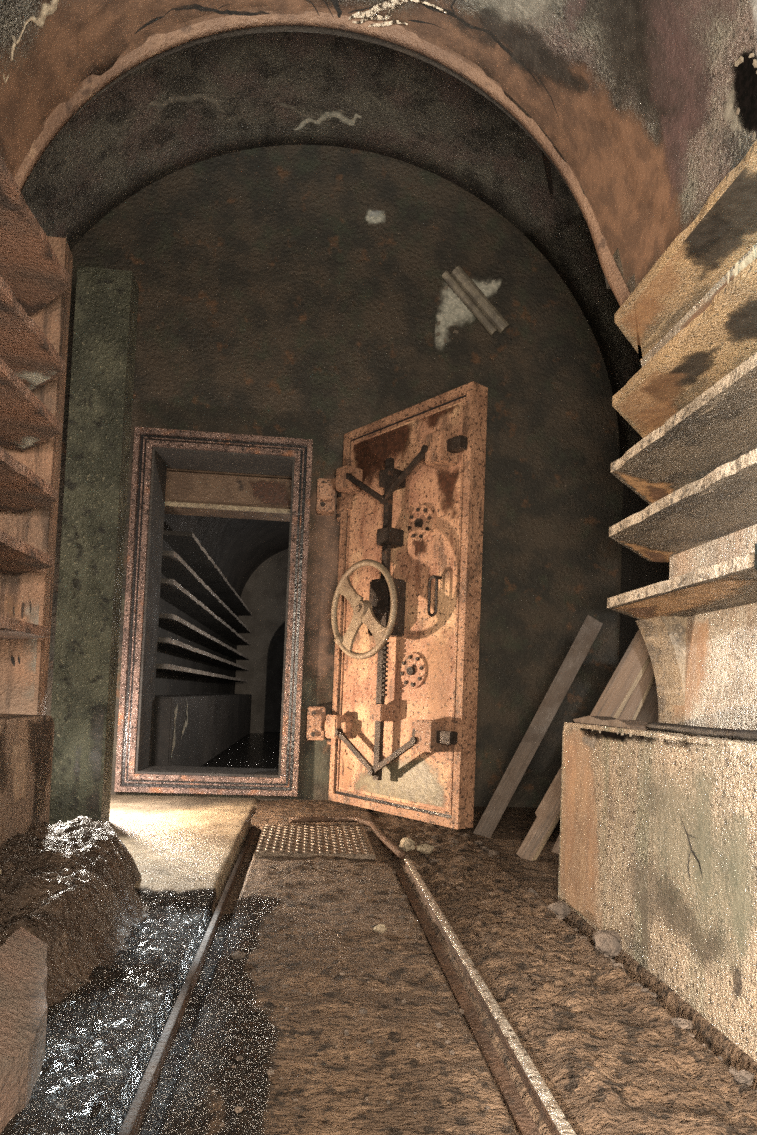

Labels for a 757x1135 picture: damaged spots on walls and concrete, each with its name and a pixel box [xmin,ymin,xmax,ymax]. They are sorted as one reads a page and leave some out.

crack [135,4,270,34]
water stain [685,169,757,283]
water stain [725,301,757,342]
water stain [642,348,717,402]
corrosion [353,405,457,485]
corrosion [438,470,459,517]
corrosion [413,540,426,556]
corrosion [307,477,339,712]